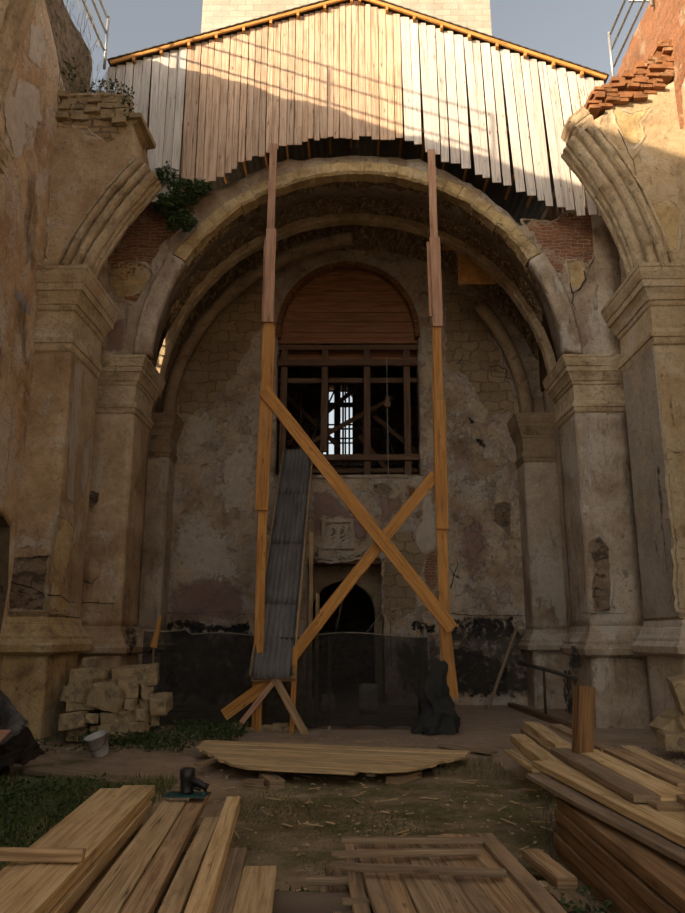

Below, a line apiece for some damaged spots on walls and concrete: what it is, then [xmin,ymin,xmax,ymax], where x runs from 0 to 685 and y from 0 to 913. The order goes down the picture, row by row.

flaking render [103,202,196,305]
flaking render [520,206,600,294]
flaking render [8,513,76,615]
spalling [585,534,615,615]